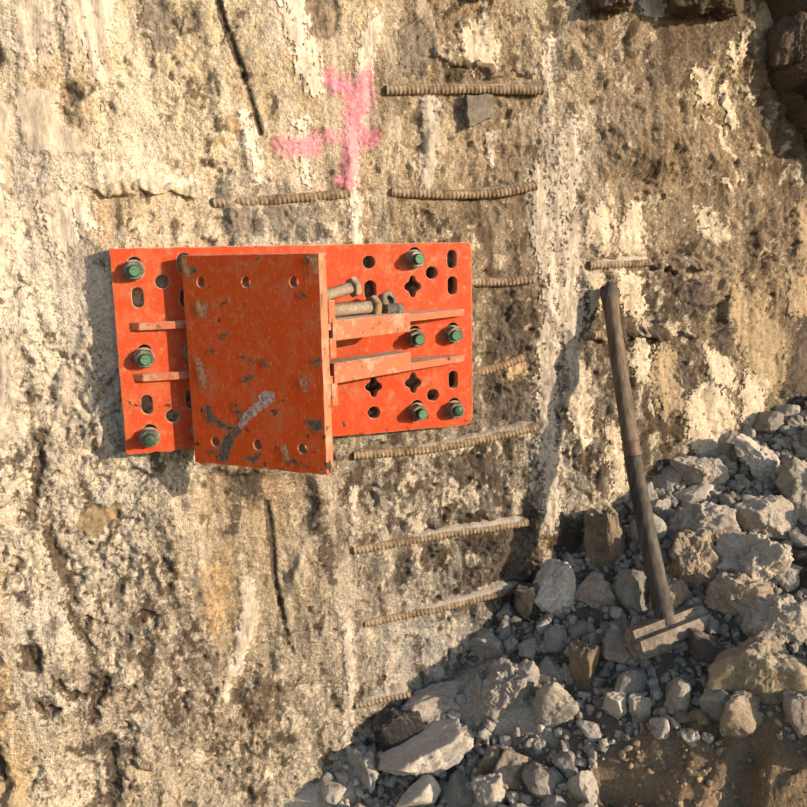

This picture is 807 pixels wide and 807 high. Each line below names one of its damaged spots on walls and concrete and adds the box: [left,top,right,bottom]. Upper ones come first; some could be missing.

crack [215,0,263,136]
spalling [386,13,544,129]
spalling [391,181,538,200]
spalling [472,275,536,287]
spalling [472,354,524,376]
corrosion [495,357,530,382]
peeling [305,418,323,434]
spalling [353,421,539,460]
spalling [353,515,529,555]
crack [264,500,291,645]
spalling [364,580,518,627]